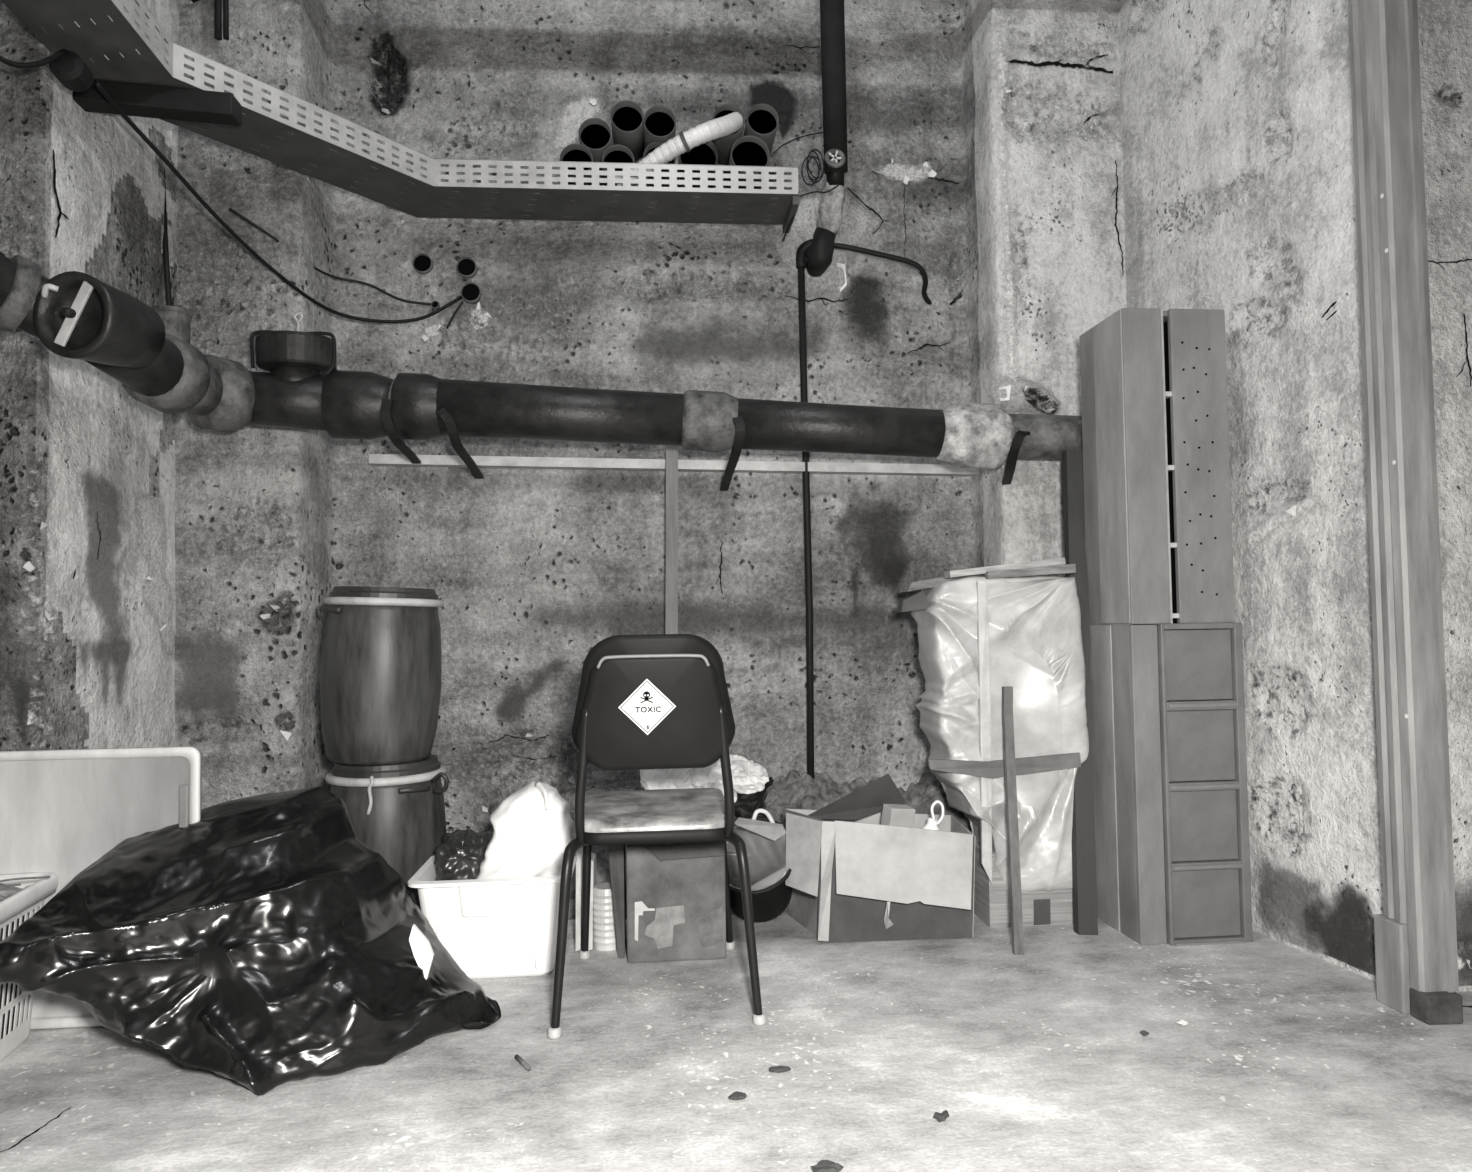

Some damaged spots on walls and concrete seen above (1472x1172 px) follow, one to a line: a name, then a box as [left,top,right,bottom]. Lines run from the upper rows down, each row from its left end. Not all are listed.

crack [1007,54,1113,74]
peeling [877,158,937,185]
crack [1111,160,1124,275]
crack [1428,259,1472,270]
damp [1305,885,1376,975]